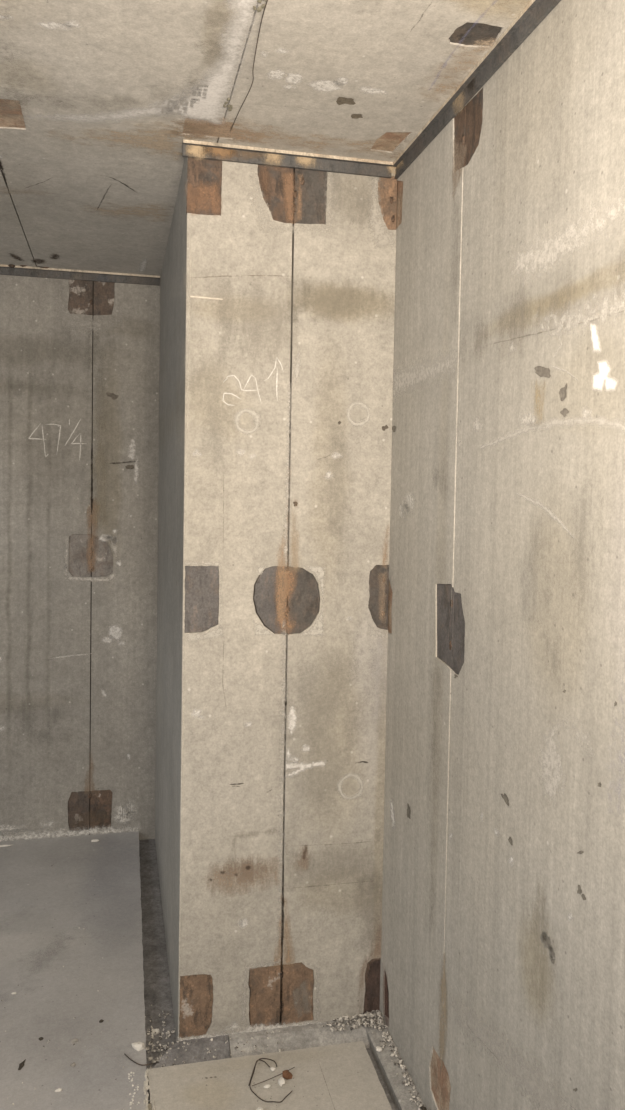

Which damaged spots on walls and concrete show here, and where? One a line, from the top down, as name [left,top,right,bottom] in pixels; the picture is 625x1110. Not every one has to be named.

corrosion [276,552,294,630]